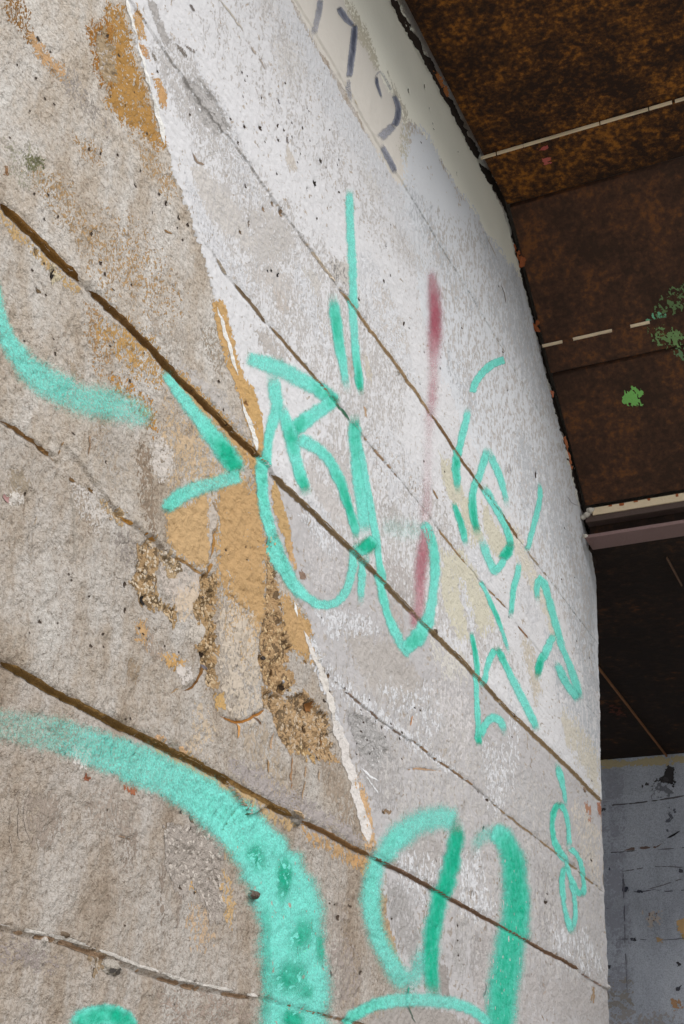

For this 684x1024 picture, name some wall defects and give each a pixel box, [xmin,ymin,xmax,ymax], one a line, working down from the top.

crack [391,0,597,566]
spalling [128,534,183,629]
spalling [193,571,220,696]
crack [0,204,684,806]
crack [135,969,248,999]
crack [0,662,684,987]